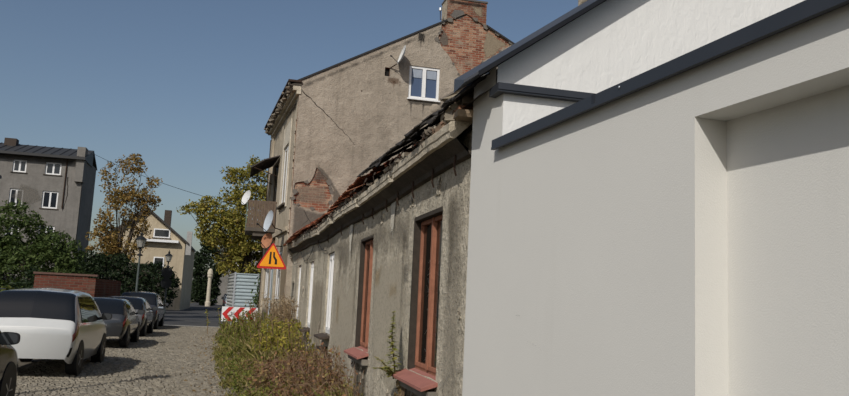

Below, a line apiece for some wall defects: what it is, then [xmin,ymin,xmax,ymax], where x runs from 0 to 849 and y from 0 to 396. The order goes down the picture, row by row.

spalling [434,14,513,76]
spalling [435,85,474,133]
spalling [279,167,340,309]